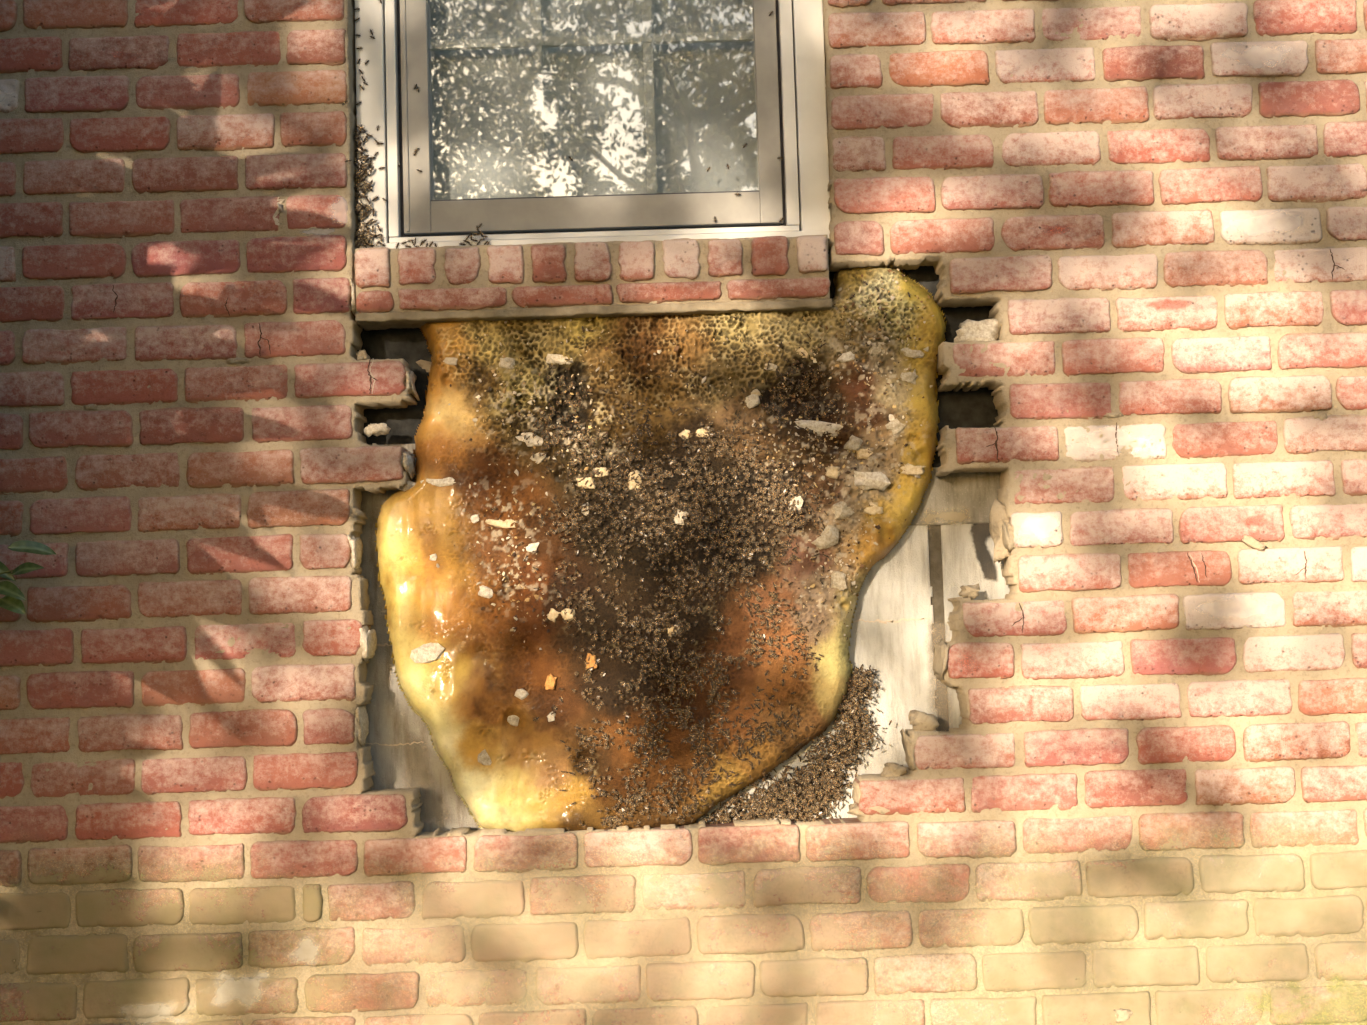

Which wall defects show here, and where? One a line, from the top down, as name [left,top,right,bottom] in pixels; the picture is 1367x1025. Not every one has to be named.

crack [225,298,271,356]
spalling [546,354,574,365]
crack [367,358,378,393]
spalling [516,432,546,464]
peeling [678,428,710,439]
peeling [576,467,609,516]
peeling [628,470,643,490]
spalling [788,496,803,511]
spalling [811,435,926,550]
peeling [470,514,517,528]
crack [1187,552,1207,582]
peeling [547,608,575,622]